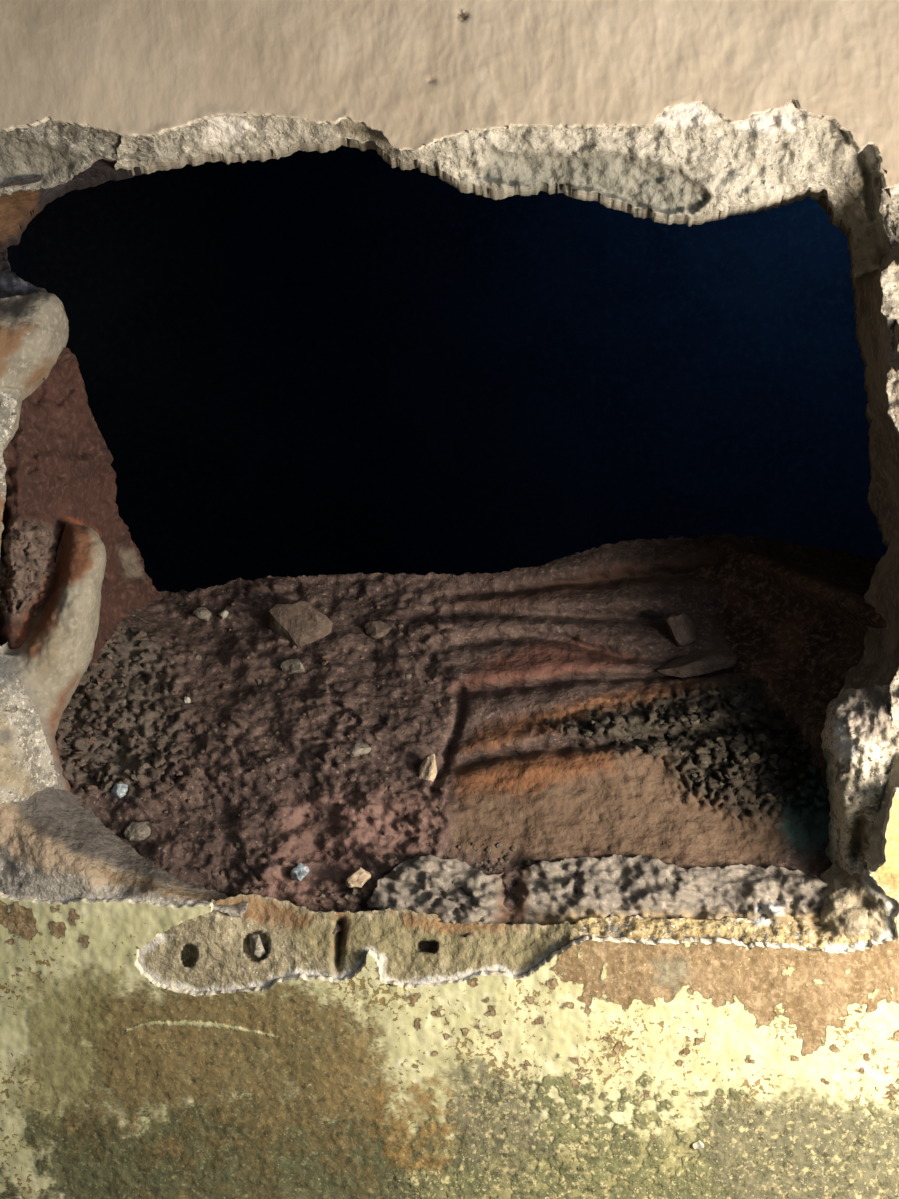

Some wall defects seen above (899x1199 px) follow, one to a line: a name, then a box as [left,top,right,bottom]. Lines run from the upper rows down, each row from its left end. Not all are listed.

spalling [0,101,899,1056]
damp [58,980,899,1199]
peeling [569,1057,589,1089]
peeling [677,1038,703,1067]